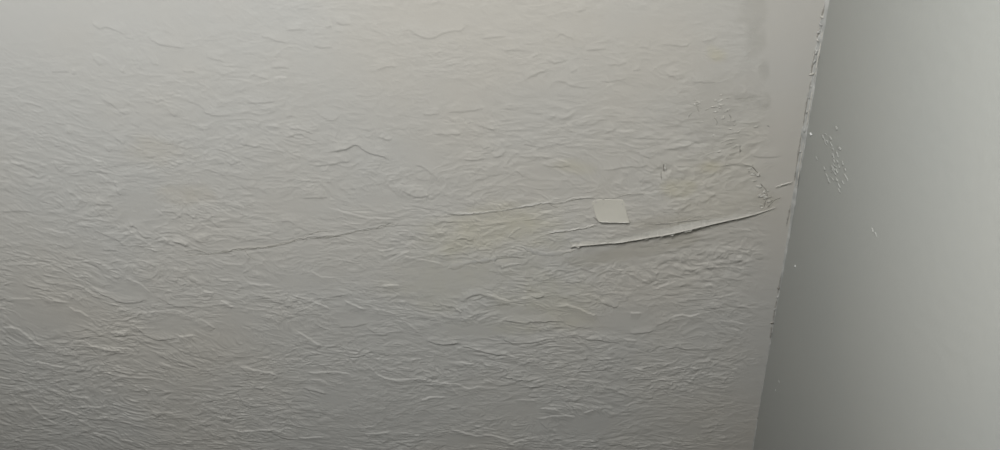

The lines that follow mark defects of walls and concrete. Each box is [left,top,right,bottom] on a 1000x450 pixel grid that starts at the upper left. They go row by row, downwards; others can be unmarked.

peeling [592,199,630,223]
crack [185,223,398,259]